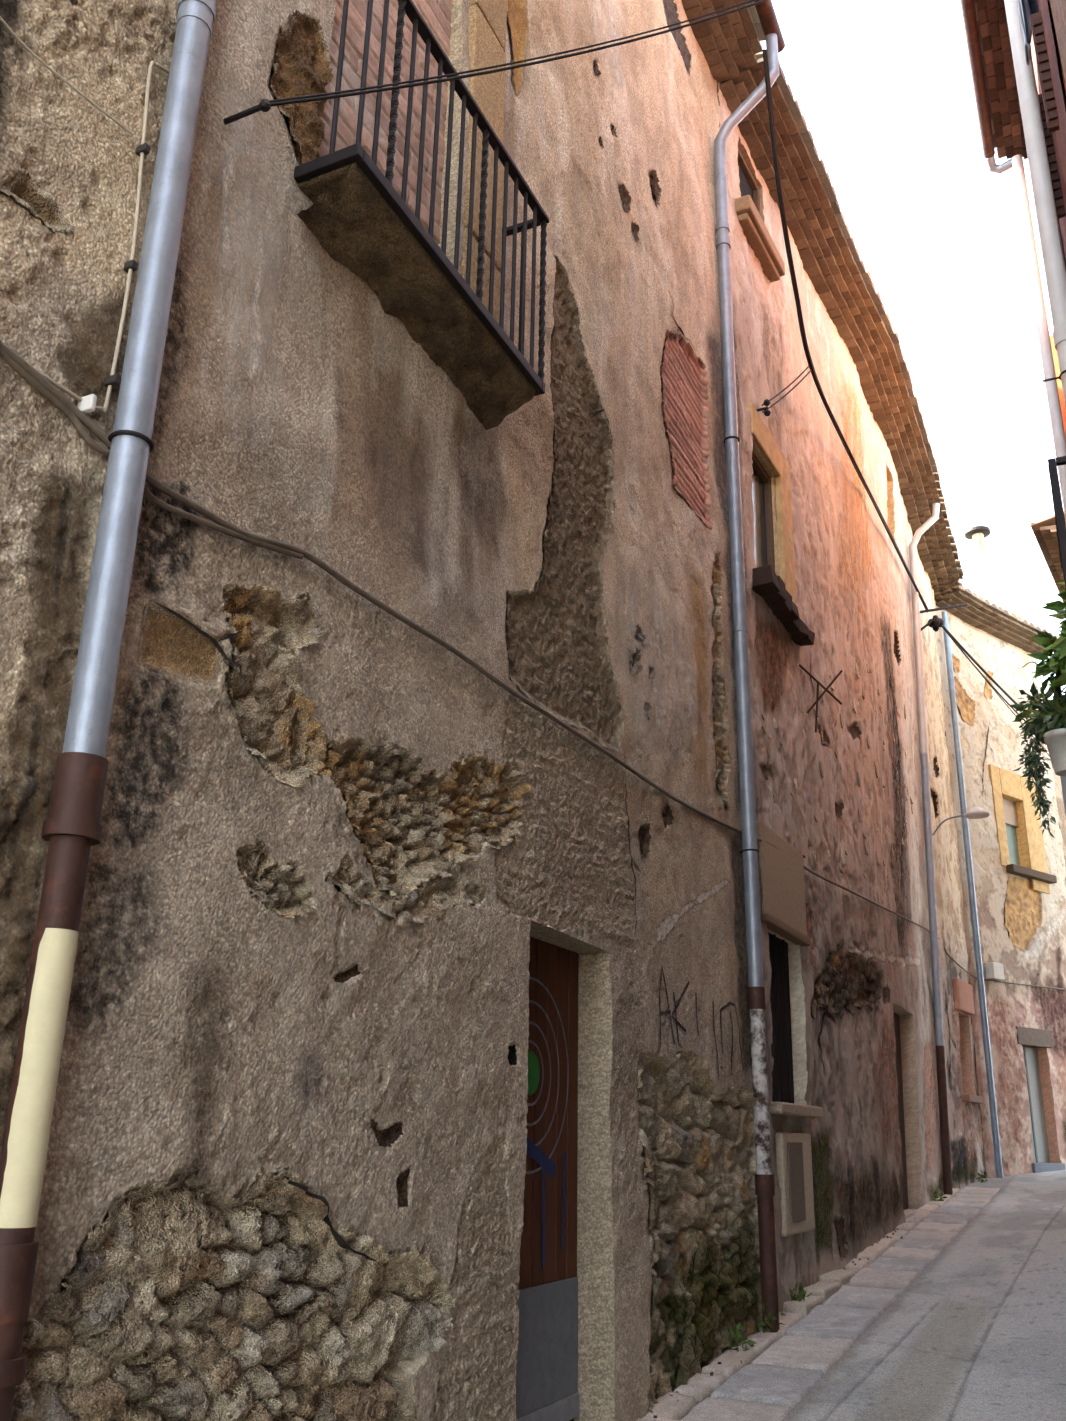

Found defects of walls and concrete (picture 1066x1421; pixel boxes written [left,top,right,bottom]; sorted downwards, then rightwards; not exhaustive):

peeling [270,10,334,164]
flaking render [660,331,713,530]
peeling [506,254,625,753]
flaking render [629,625,656,679]
flaking render [137,584,531,926]
peeling [1004,876,1042,952]
flaking render [811,941,890,1019]
crack [283,1176,376,1261]
spalling [397,1168,410,1207]